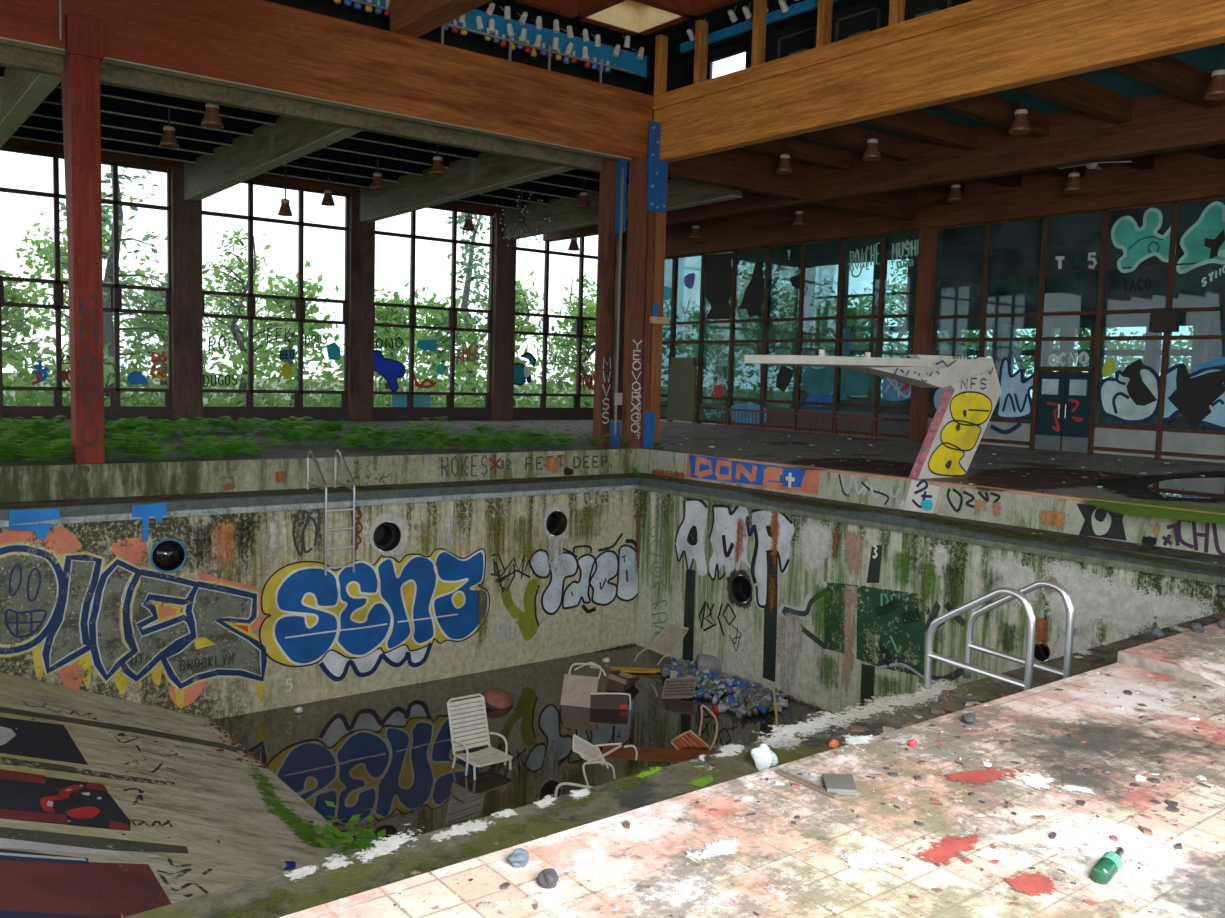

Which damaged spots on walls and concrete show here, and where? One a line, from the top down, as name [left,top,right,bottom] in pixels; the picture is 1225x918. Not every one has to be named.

leakage [967,467,1225,503]
leakage [194,524,211,560]
leakage [233,520,277,553]
leakage [415,521,431,555]
corrosion [769,512,779,609]
leakage [476,582,488,642]
leakage [812,532,868,692]
leakage [894,553,959,668]
leakage [982,572,1021,653]
peeling [989,554,1225,659]
leakage [873,675,896,701]